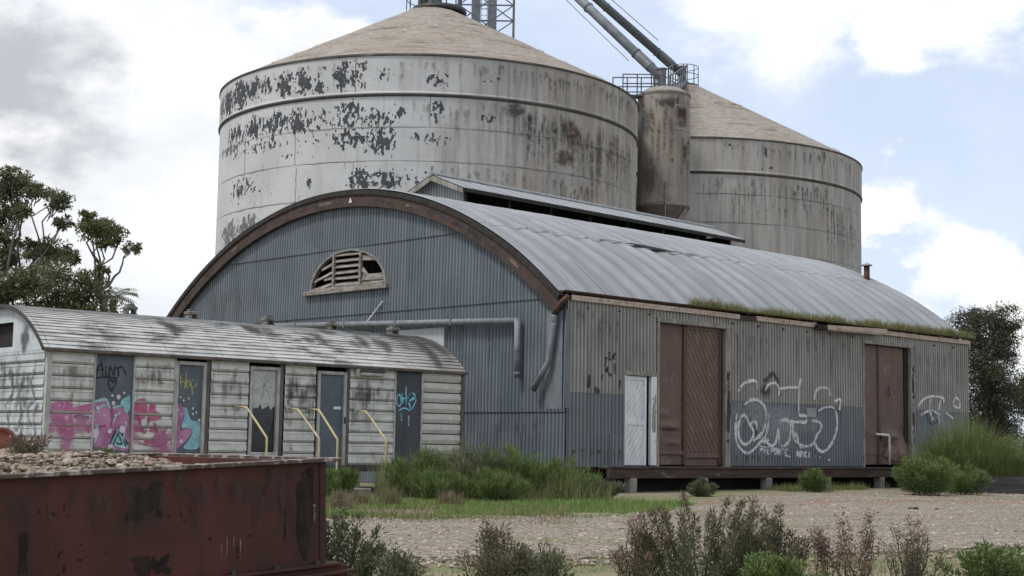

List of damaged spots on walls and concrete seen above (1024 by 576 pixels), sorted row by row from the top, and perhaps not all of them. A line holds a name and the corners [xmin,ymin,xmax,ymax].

peeling [220,60,427,203]
peeling [221,175,273,252]